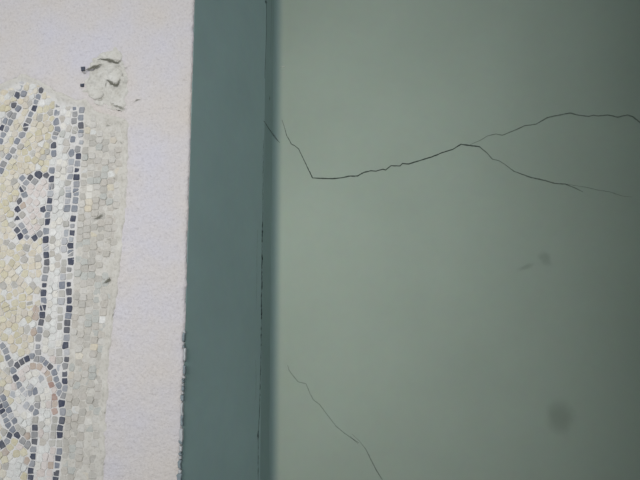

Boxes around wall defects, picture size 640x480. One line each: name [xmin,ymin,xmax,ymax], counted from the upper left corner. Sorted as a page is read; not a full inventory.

crack [263,113,640,190]
crack [258,216,266,336]